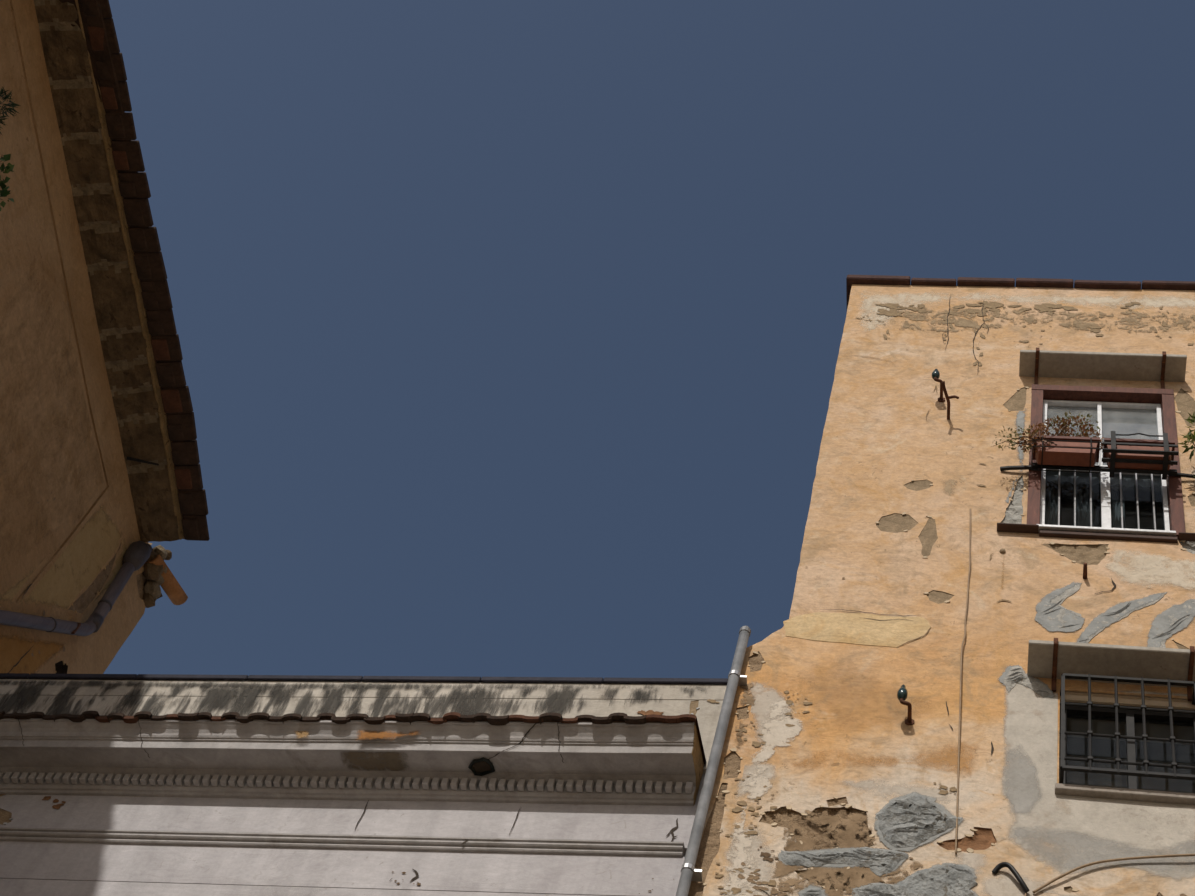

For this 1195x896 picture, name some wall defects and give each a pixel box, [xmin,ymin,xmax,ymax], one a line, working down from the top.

peeling [855,301,1195,372]
spalling [904,479,933,491]
spalling [875,512,938,558]
spalling [923,590,954,604]
water stain [0,637,583,717]
water stain [633,687,651,701]
crack [488,721,564,763]
spalling [688,651,923,896]
spalling [936,827,997,853]